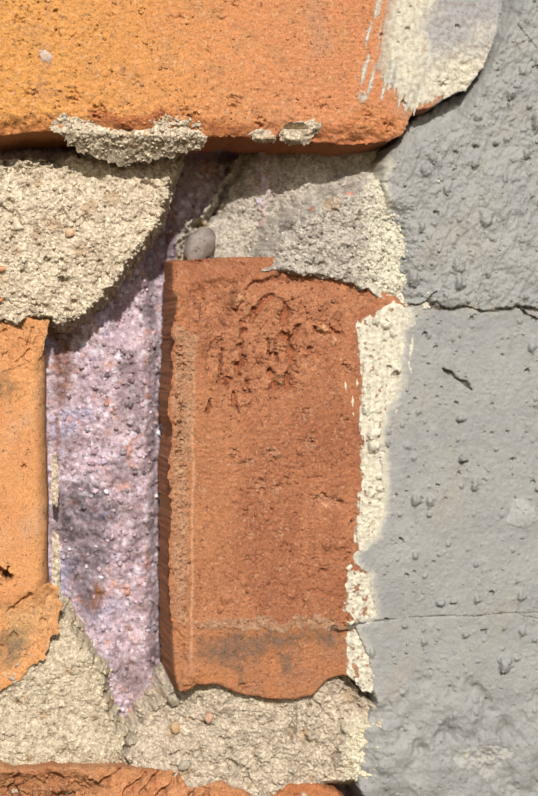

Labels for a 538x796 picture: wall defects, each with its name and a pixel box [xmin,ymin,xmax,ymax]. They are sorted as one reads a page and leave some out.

peeling [331,0,499,145]
spalling [86,106,243,138]
crack [406,292,538,319]
spalling [0,317,50,385]
spalling [167,272,416,628]
spalling [0,582,63,691]
peeling [343,564,380,693]
crack [191,612,538,635]
spalling [0,765,250,796]
peeling [452,746,514,780]